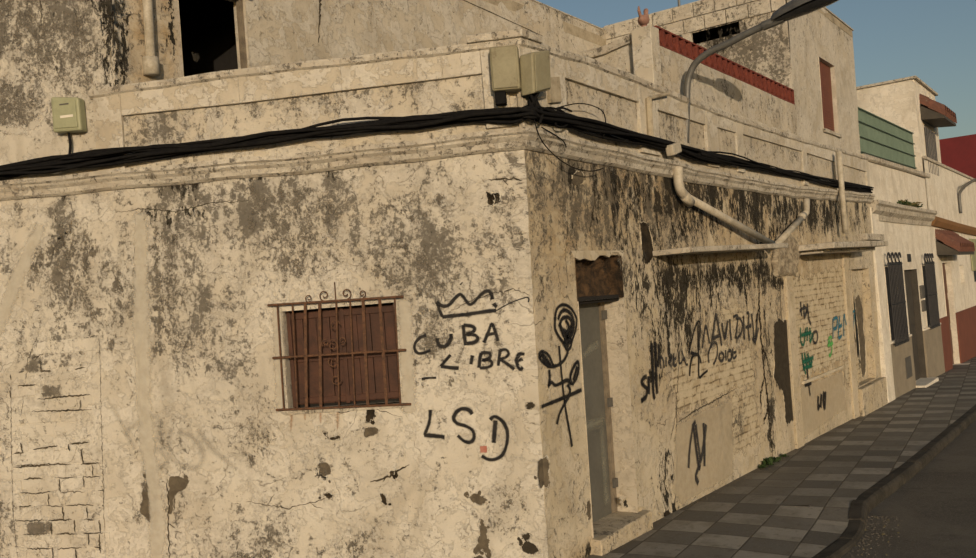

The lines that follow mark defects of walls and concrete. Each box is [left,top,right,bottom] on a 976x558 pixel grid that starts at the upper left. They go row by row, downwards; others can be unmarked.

leakage [160,0,175,59]
crack [316,0,324,43]
leakage [0,0,130,127]
leakage [713,190,796,240]
leakage [642,207,784,388]
flaking render [6,337,110,558]
spalling [364,409,381,438]
spalling [140,474,155,524]
spalling [168,475,190,518]
leakage [660,449,675,512]
spalling [472,519,494,558]
spalling [517,533,542,555]